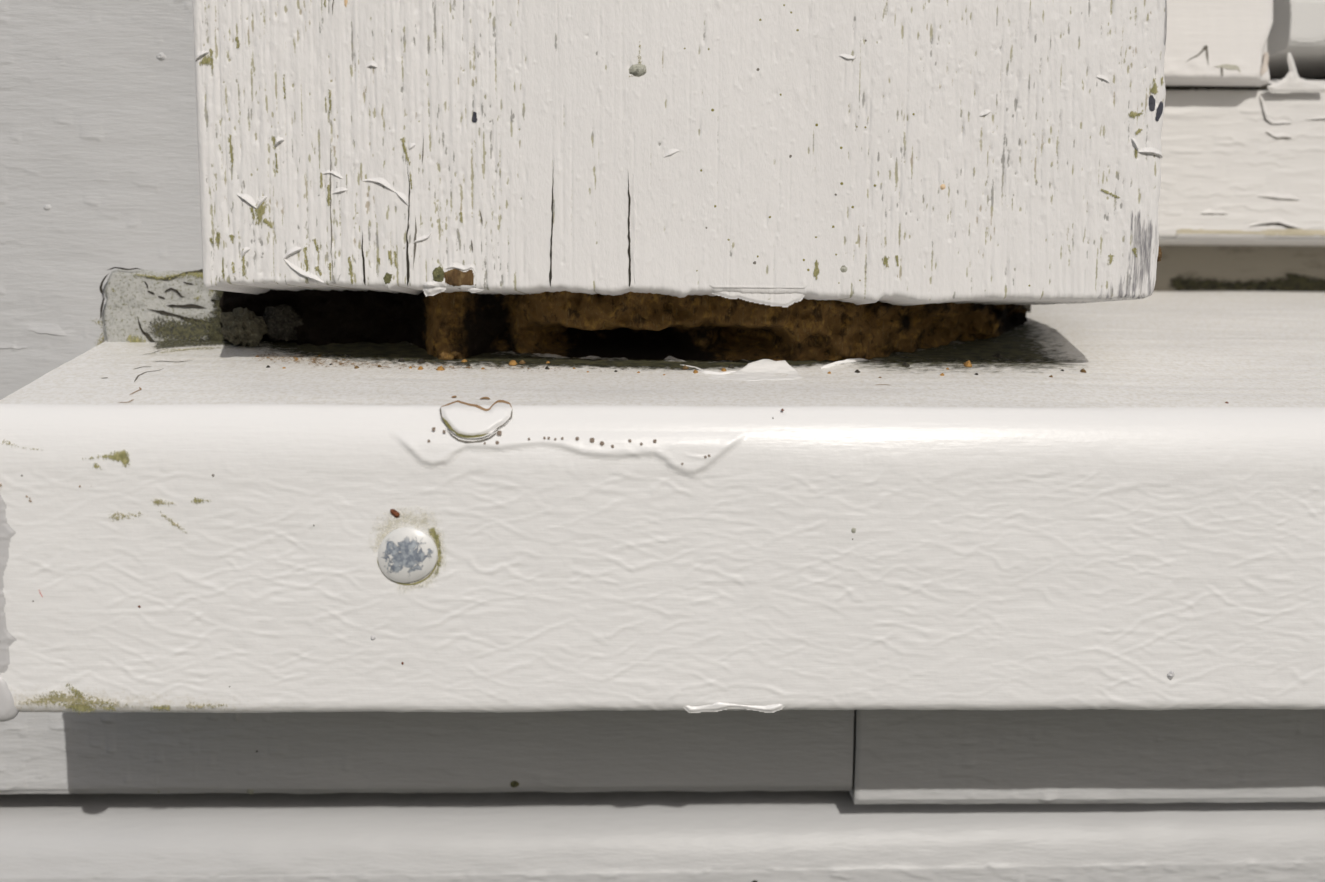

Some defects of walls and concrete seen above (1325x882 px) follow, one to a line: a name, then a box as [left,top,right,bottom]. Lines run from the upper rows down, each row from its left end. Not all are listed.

spalling [423,261,484,297]
peeling [709,285,807,307]
leakage [127,272,767,370]
leakage [786,323,1076,372]